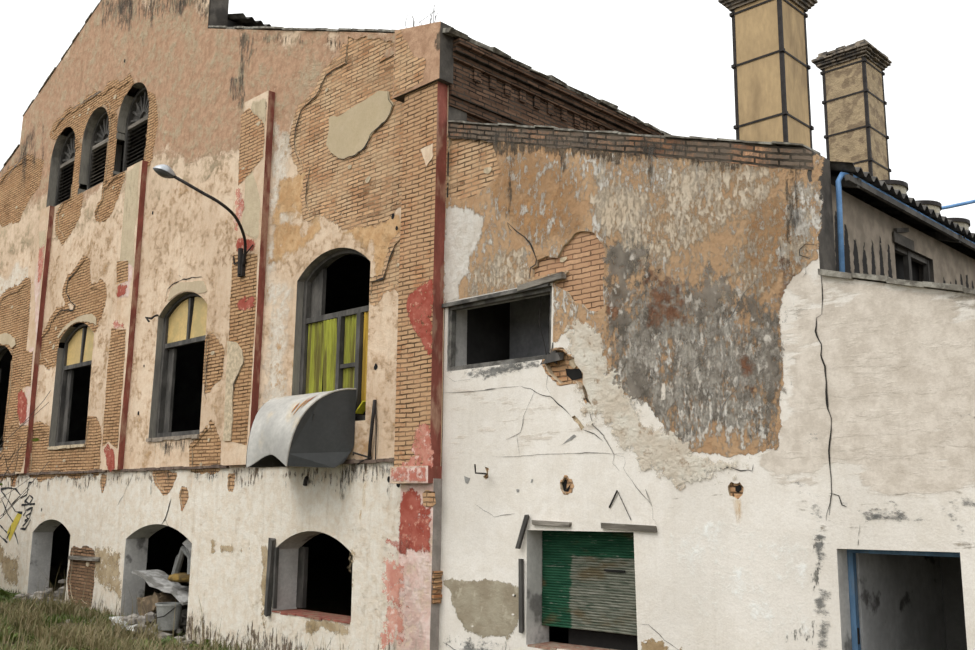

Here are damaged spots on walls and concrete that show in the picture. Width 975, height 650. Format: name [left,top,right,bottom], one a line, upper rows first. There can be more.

flaking render [0,154,44,228]
flaking render [289,29,426,231]
flaking render [0,244,128,493]
crack [446,375,654,520]
peeling [369,134,825,457]
crack [799,244,846,516]
peeling [431,571,519,639]
peeling [641,638,682,650]